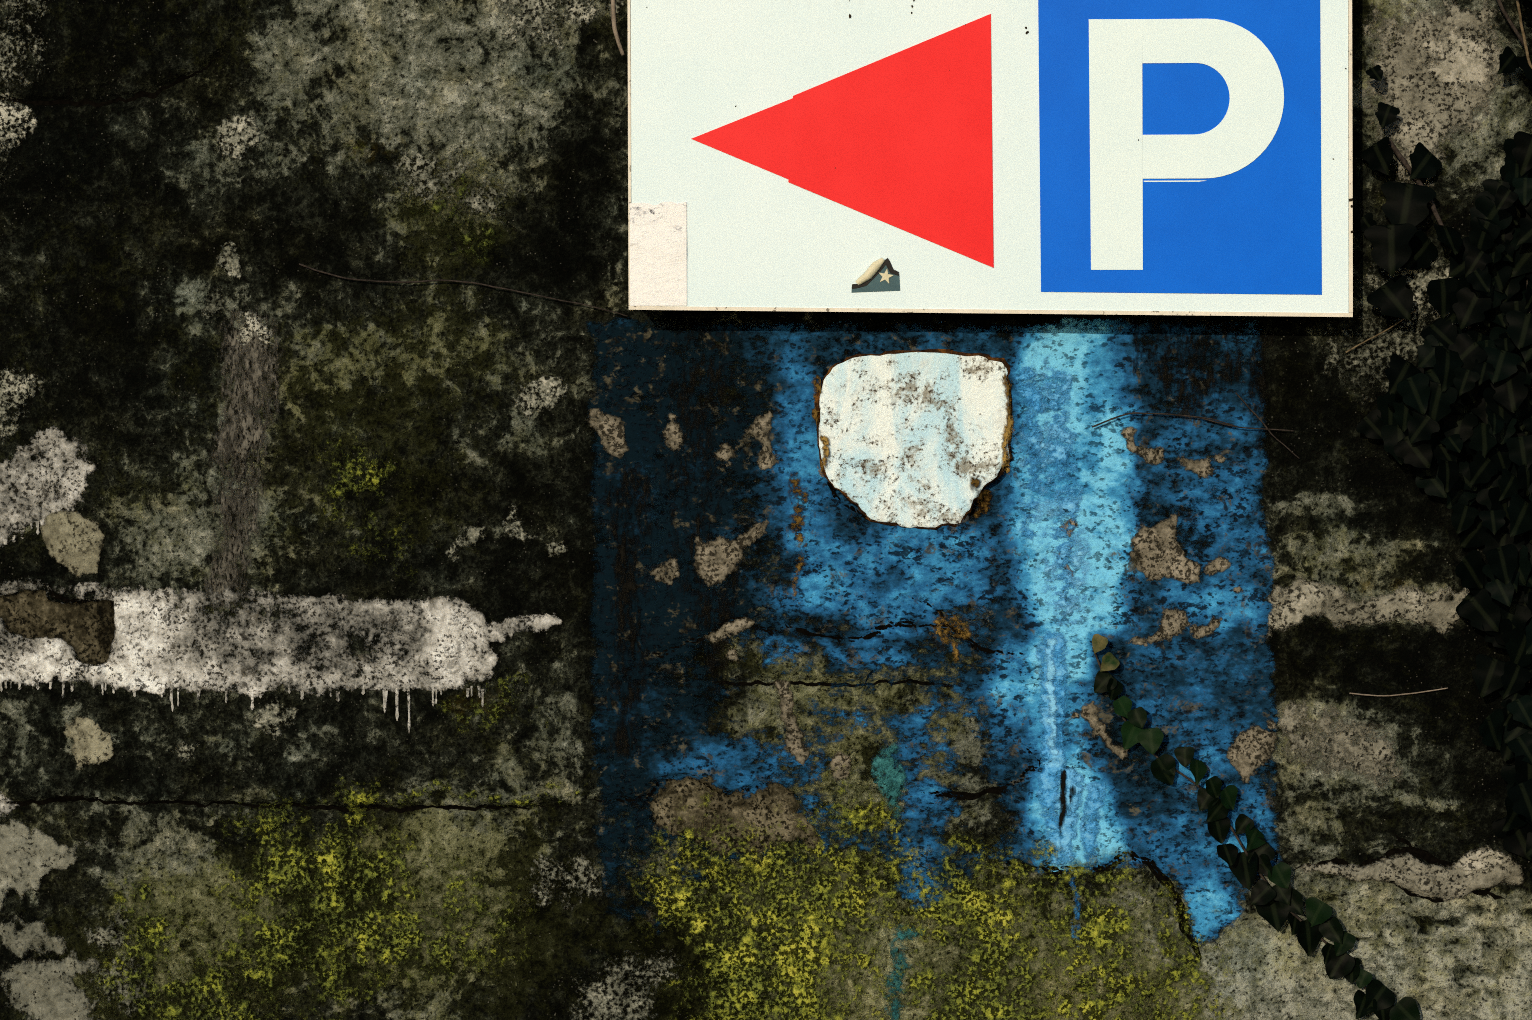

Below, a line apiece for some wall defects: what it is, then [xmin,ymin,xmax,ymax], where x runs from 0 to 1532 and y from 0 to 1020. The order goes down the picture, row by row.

crack [0,53,225,108]
spalling [588,408,629,459]
spalling [649,519,769,587]
spalling [1129,512,1231,584]
spalling [1128,608,1222,646]
peeling [1226,701,1402,788]
crack [7,776,764,826]
spalling [648,776,823,856]
damp [884,926,923,1020]